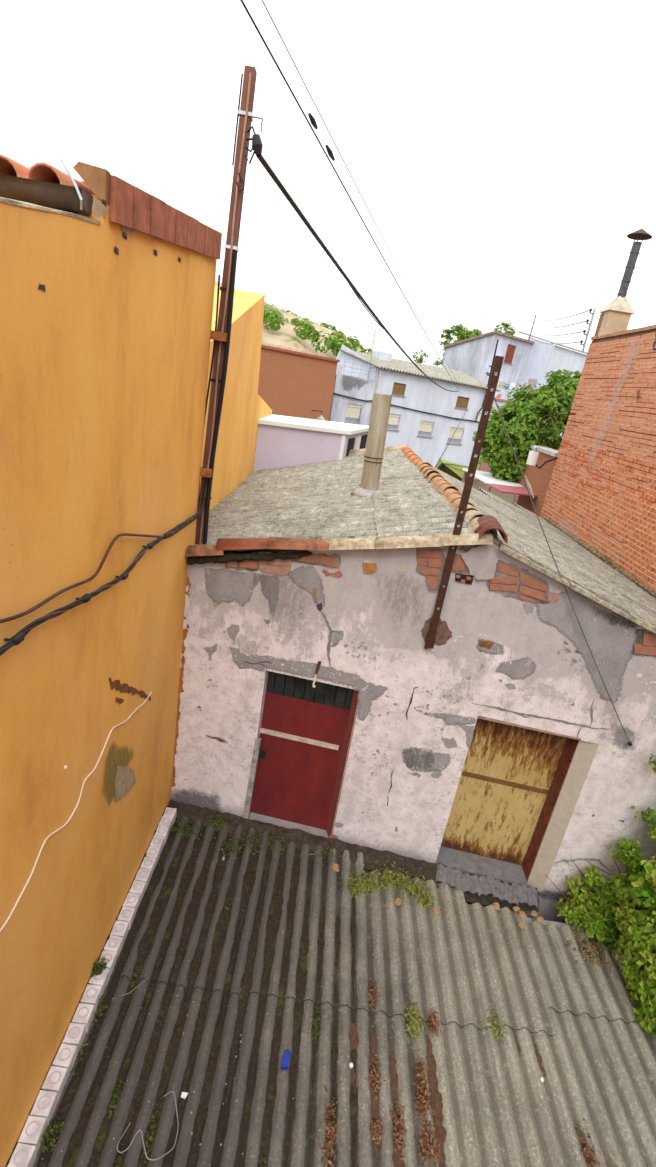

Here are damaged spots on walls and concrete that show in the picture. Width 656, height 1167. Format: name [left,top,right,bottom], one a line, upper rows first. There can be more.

flaking render [204,551,341,624]
crack [312,587,341,667]
flaking render [204,624,476,779]
flaking render [416,547,656,703]